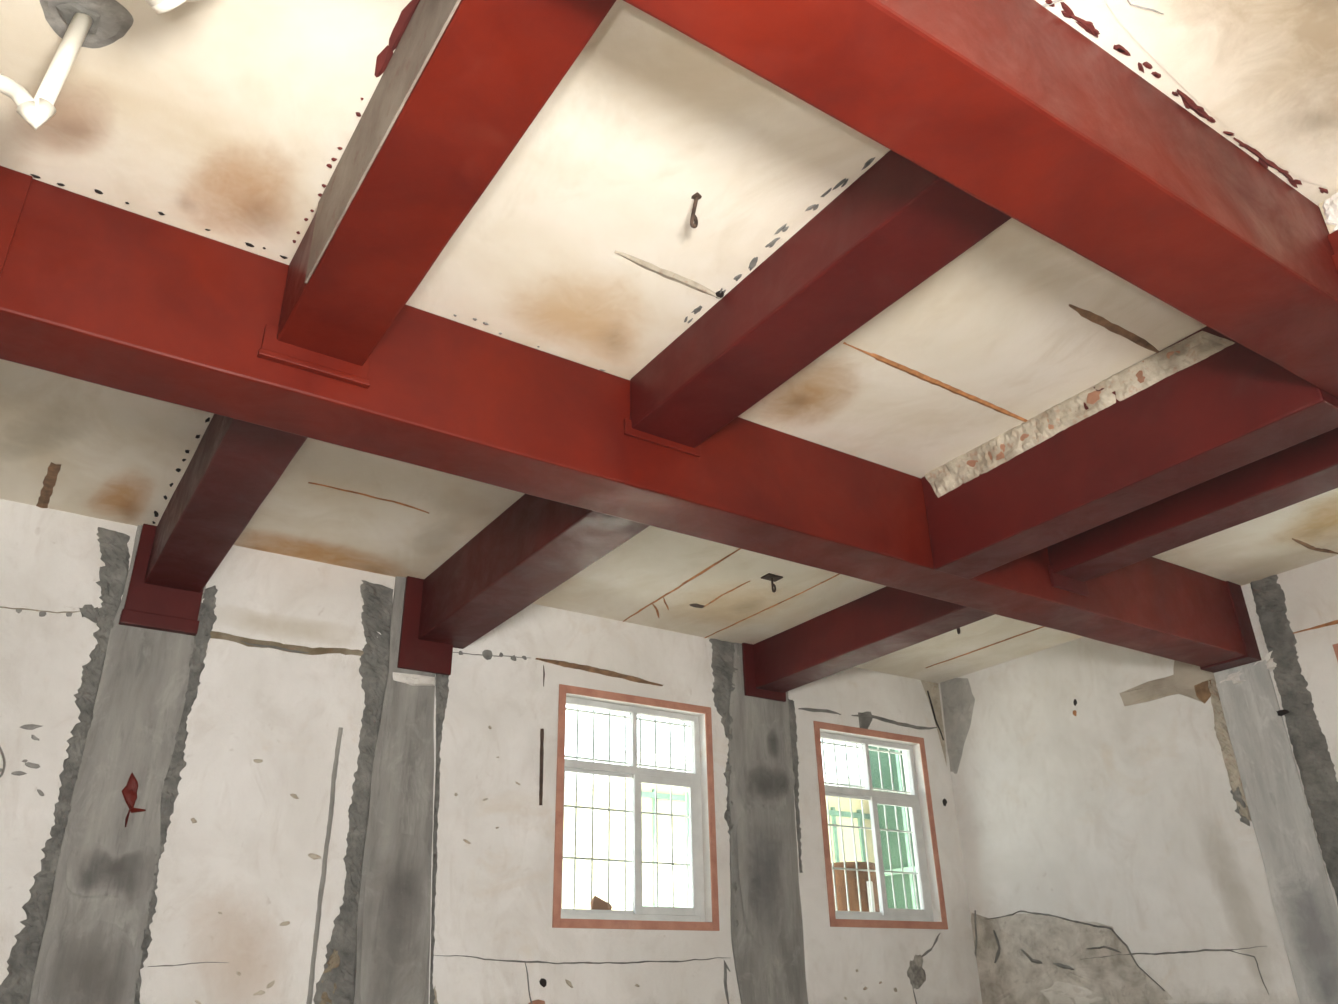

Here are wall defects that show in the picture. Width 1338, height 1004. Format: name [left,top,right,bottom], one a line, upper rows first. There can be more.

spalling [0,527,130,1004]
spalling [134,585,218,1004]